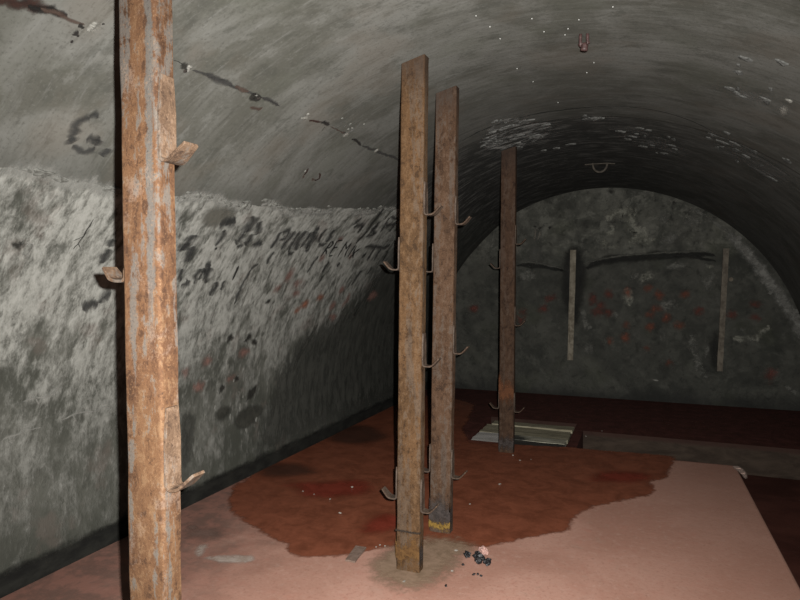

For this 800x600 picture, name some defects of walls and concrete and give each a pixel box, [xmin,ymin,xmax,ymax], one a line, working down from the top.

crack [174,60,279,106]
crack [309,120,399,161]
peeling [480,117,553,150]
crack [585,251,716,269]
water stain [229,251,399,557]
water stain [423,396,675,547]